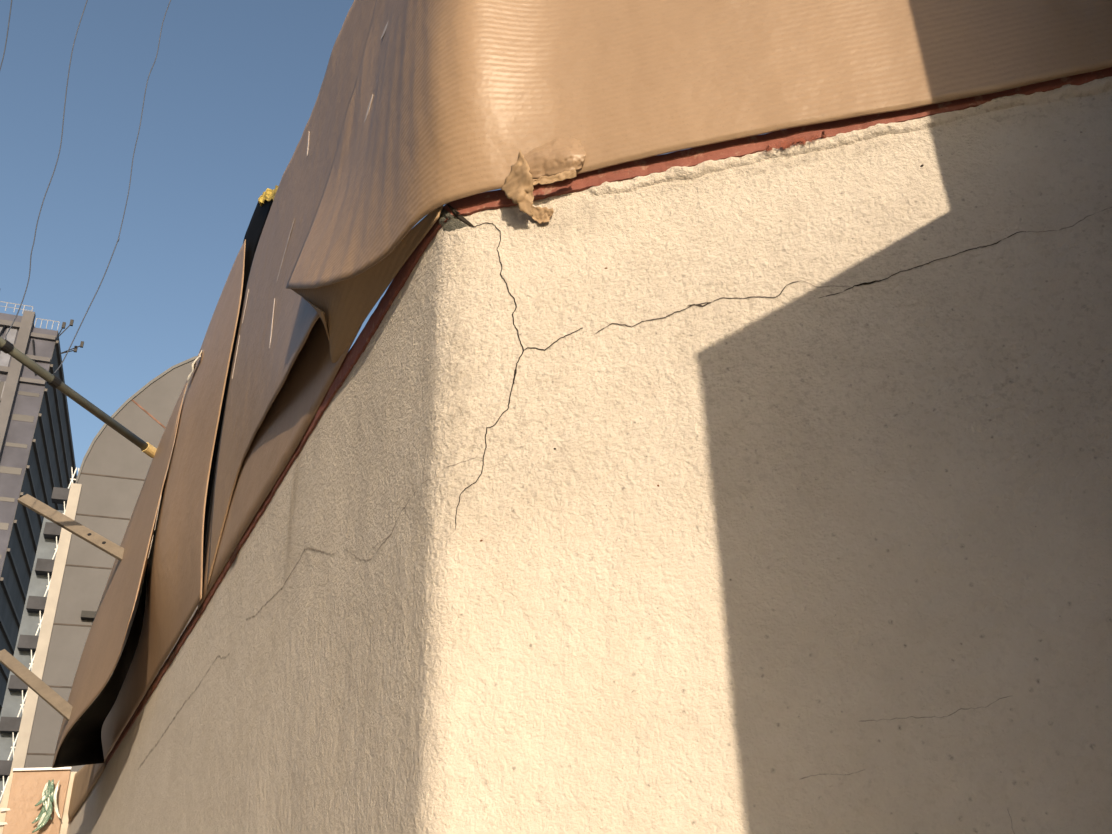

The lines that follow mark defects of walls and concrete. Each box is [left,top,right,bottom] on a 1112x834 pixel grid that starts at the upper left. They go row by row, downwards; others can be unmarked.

flaking render [438,204,475,232]
crack [820,222,1078,298]
crack [455,218,798,528]